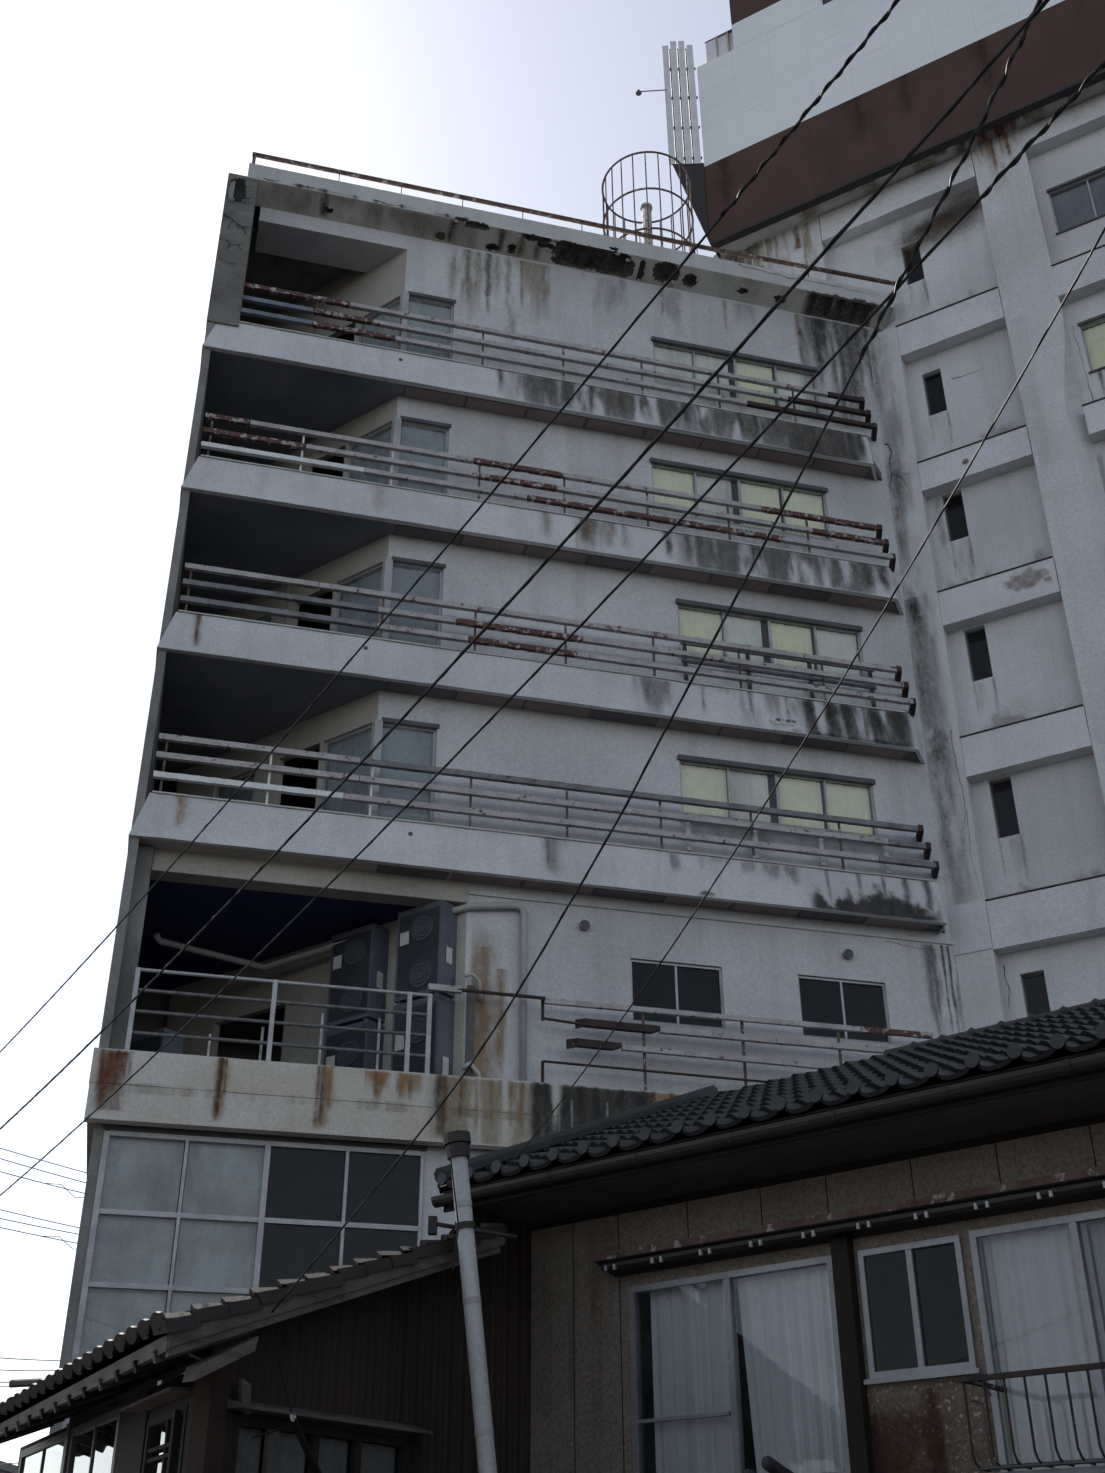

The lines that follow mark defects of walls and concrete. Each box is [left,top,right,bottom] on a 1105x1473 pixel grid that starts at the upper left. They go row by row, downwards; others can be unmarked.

leakage [453,229,549,298]
leakage [520,291,877,460]
leakage [666,535,889,593]
leakage [796,700,913,747]
leakage [815,874,939,921]
rust [367,955,527,1140]
rust [97,1049,128,1110]
rust [214,1057,228,1113]
rust [315,1065,333,1122]